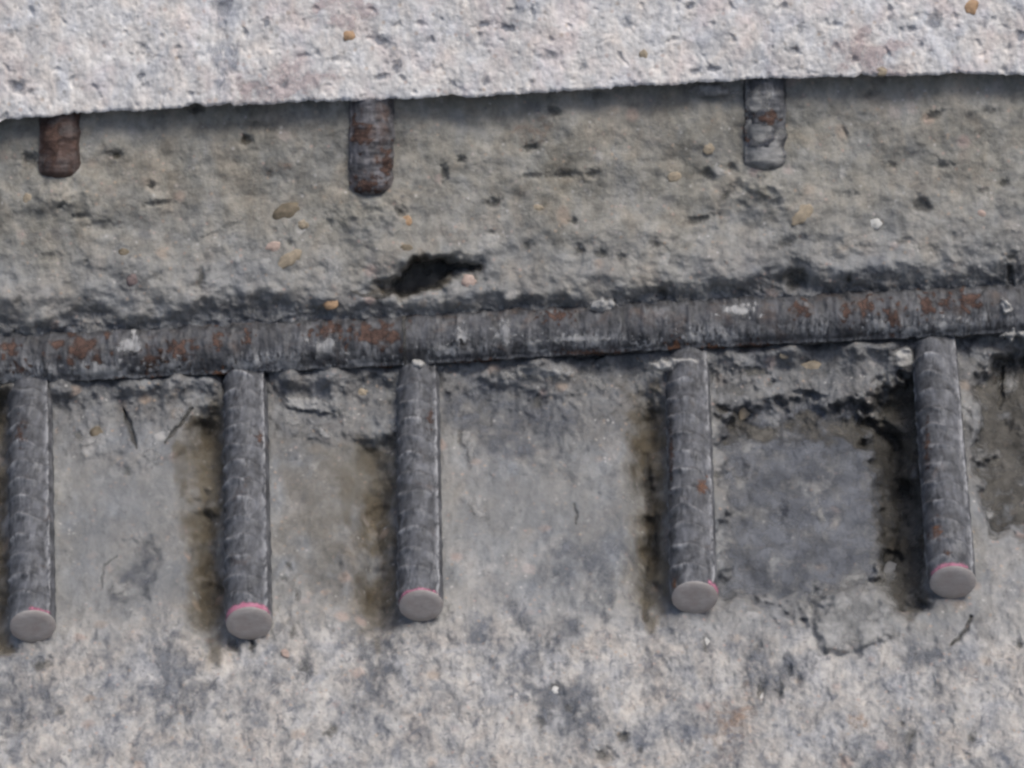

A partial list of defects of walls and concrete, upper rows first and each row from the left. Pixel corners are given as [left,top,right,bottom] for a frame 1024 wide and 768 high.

rust [743,109,782,143]
rust [349,113,394,194]
spalling [351,256,482,299]
rust [42,332,113,370]
rust [135,339,200,378]
rust [297,319,403,353]
rust [840,286,983,337]
spalling [444,371,576,461]
spalling [972,355,1024,536]
spalling [717,372,926,653]